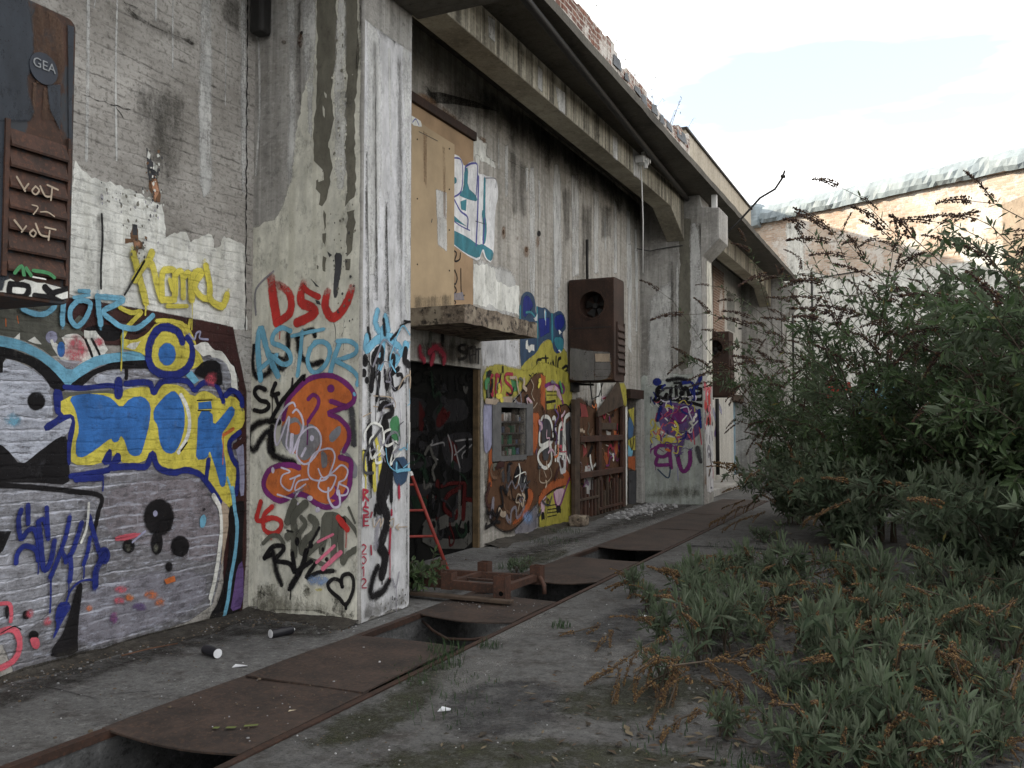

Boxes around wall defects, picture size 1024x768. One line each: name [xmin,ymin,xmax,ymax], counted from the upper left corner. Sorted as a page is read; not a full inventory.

spalling [125,224,143,253]
spalling [146,148,161,202]
peeling [313,0,360,298]
water stain [427,82,640,352]